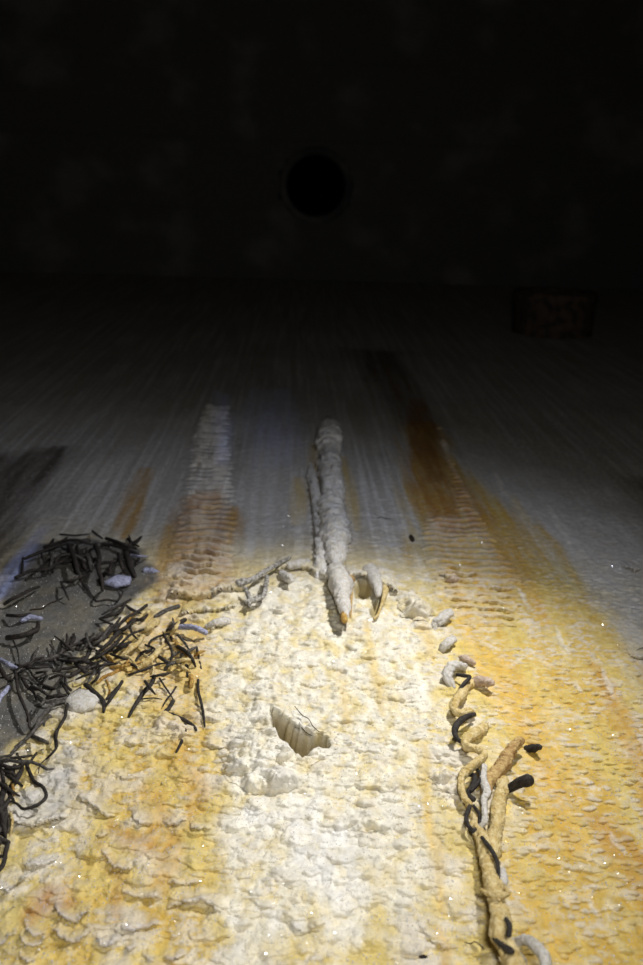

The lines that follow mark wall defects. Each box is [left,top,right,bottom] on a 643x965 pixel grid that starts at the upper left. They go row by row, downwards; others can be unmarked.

corrosion [109,466,157,541]
corrosion [341,455,363,532]
corrosion [0,494,236,965]
efflorescence [209,386,476,965]
corrosion [333,667,355,727]
corrosion [360,620,390,719]
corrosion [385,398,643,965]